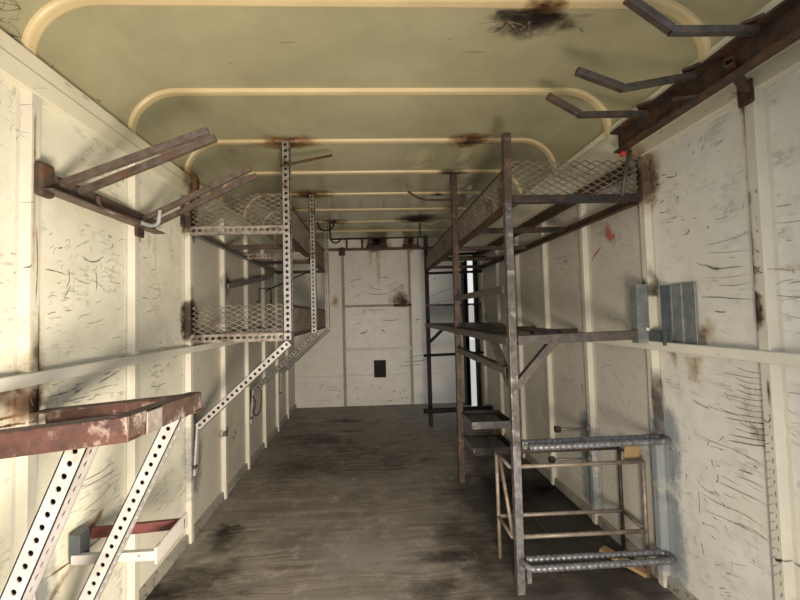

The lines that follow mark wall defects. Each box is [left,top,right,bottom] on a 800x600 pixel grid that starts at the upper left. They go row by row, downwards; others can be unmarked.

corrosion [264,137,312,147]
corrosion [454,134,487,147]
corrosion [631,147,658,204]
corrosion [180,300,198,341]
corrosion [0,387,41,428]